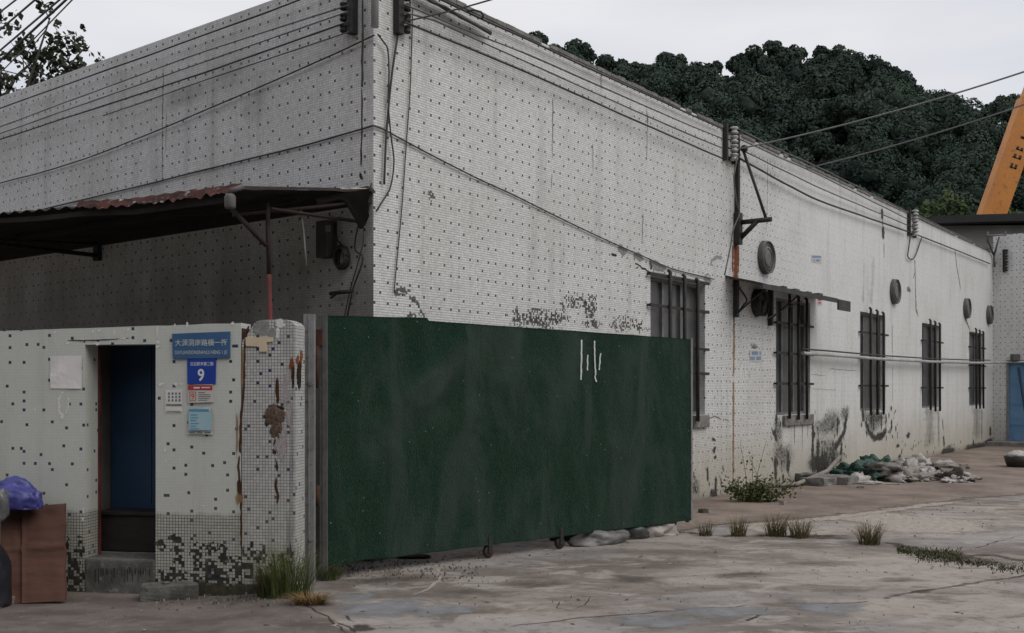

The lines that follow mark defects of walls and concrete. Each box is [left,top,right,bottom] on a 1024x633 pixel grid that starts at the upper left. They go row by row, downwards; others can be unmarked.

peeling [507,293,650,334]
rust [289,351,303,390]
spalling [264,404,286,454]
leakage [771,406,993,482]
peeling [65,535,85,592]
peeling [154,533,294,588]